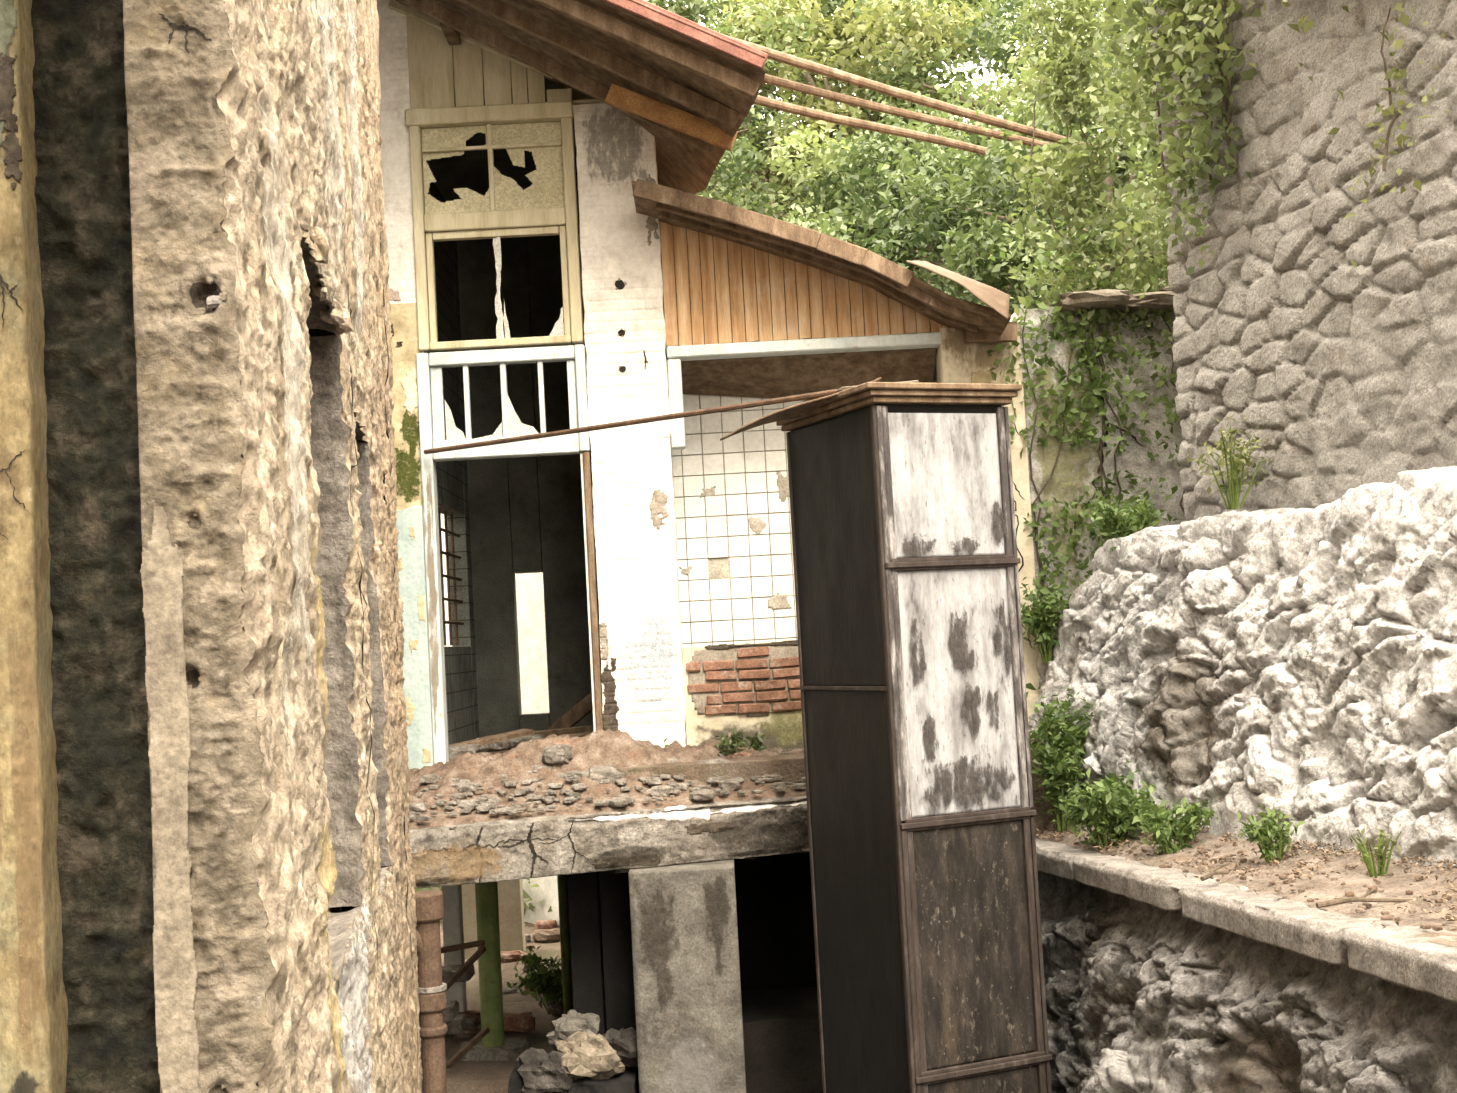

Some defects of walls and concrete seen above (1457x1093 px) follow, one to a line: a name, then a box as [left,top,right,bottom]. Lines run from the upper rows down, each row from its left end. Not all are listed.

crack [158,13,212,54]
flaking render [0,0,23,191]
crack [0,274,23,328]
crack [0,450,28,542]
flaking render [686,639,802,717]
leakage [635,886,679,1006]
leakage [704,876,731,975]
leakage [11,1072,38,1093]